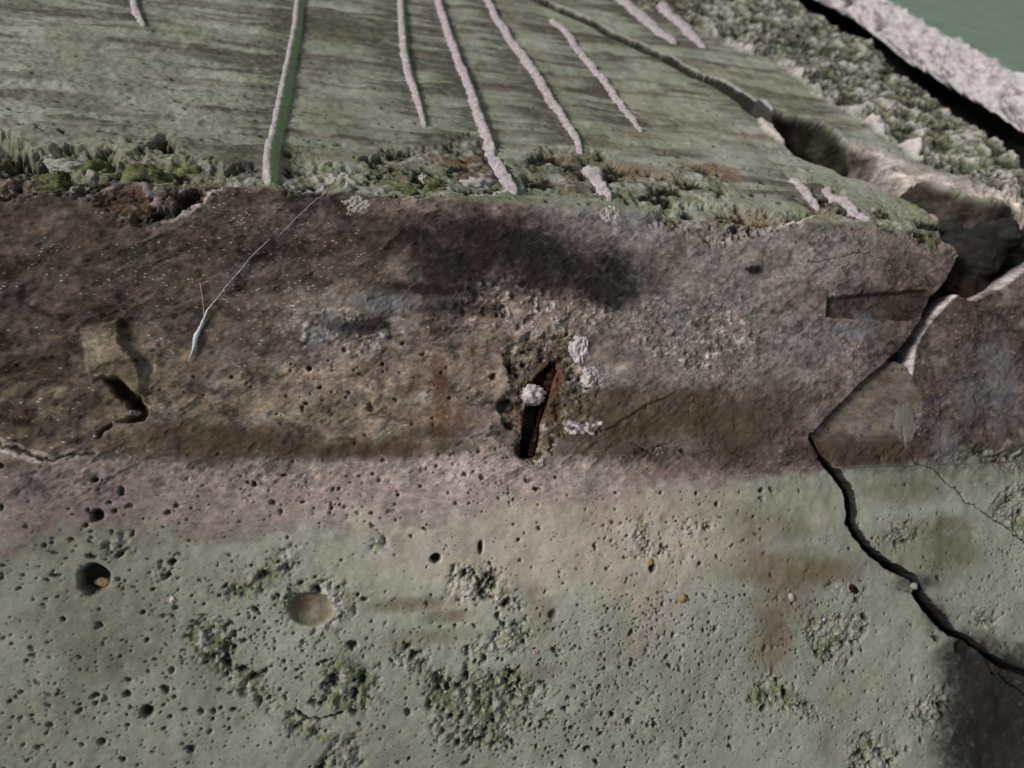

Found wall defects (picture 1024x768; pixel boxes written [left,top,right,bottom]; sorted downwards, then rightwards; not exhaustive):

crack [532,0,1024,229]
peeling [81,317,159,438]
rust [536,368,560,422]
spalling [497,331,603,463]
damp [559,336,773,453]
crack [837,247,1024,406]
crack [808,429,1024,674]